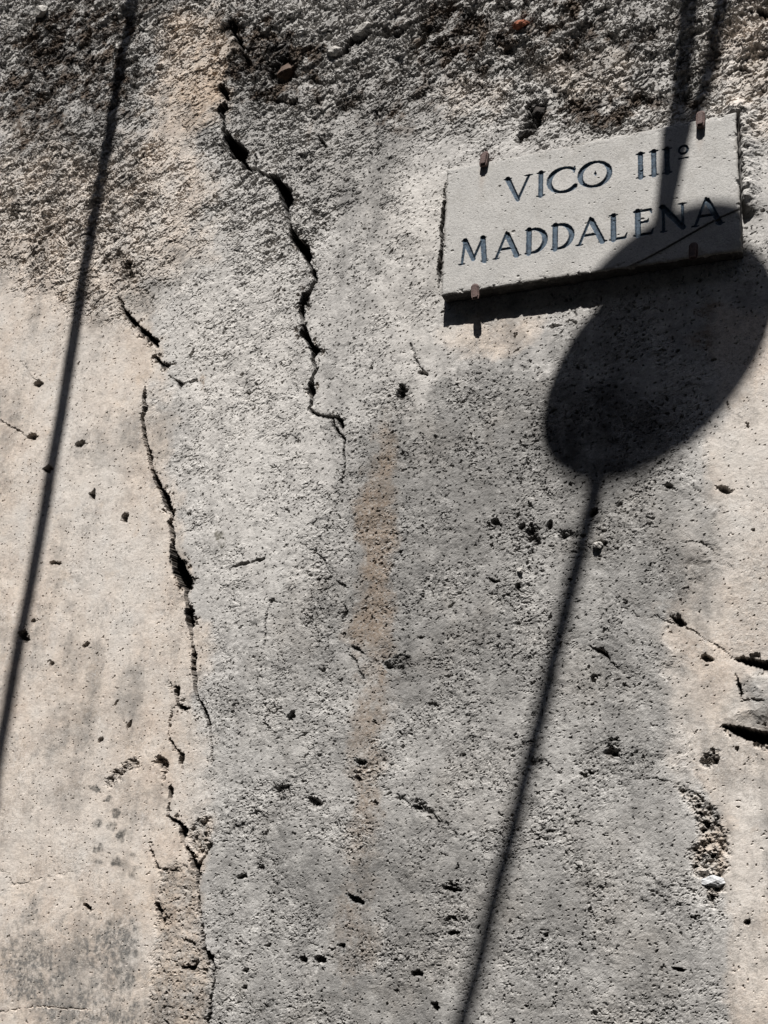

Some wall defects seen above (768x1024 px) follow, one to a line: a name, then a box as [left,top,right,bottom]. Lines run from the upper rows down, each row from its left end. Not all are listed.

crack [229,18,252,69]
crack [216,83,366,680]
crack [676,540,735,571]
crack [117,297,217,1024]
crack [620,606,768,745]
spalling [669,775,736,914]